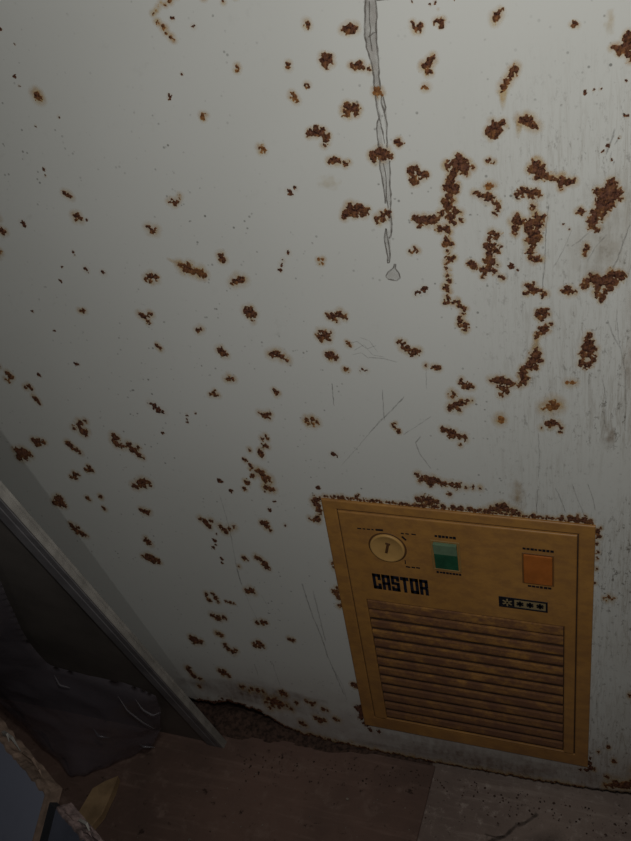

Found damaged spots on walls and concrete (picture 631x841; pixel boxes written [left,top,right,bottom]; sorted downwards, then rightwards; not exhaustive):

corrosion [610,30,631,62]
corrosion [305,125,331,147]
corrosion [327,156,350,167]
corrosion [407,164,430,186]
corrosion [465,157,576,280]
corrosion [575,177,624,233]
corrosion [411,152,475,332]
corrosion [176,261,207,279]
corrosion [560,267,628,303]
corrosion [489,281,553,398]
corrosion [577,332,598,370]
corrosion [111,433,145,460]